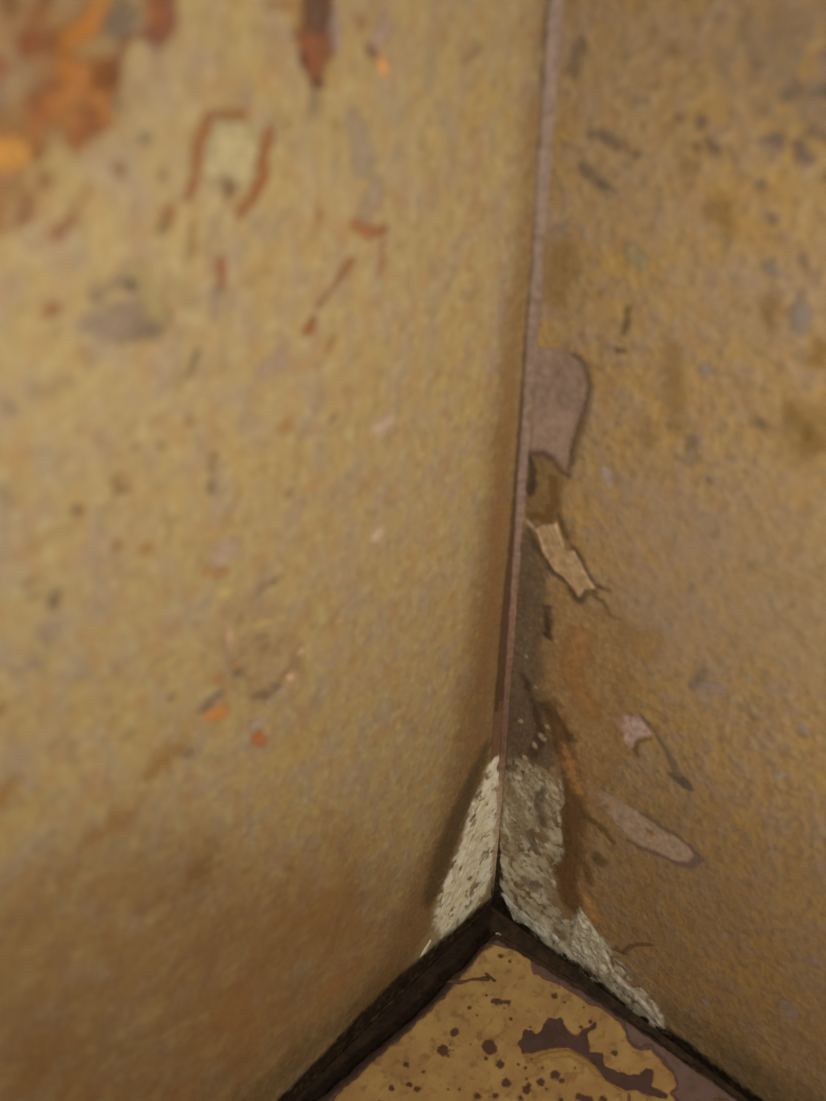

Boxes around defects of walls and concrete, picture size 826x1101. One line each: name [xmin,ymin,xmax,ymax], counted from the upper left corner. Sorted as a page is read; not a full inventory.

corrosion [290,0,339,88]
corrosion [0,0,178,231]
spalling [529,348,594,478]
peeling [527,514,610,608]
damp [357,271,665,1028]
spalling [615,714,694,791]
spalling [591,787,702,868]
damp [317,939,676,1101]